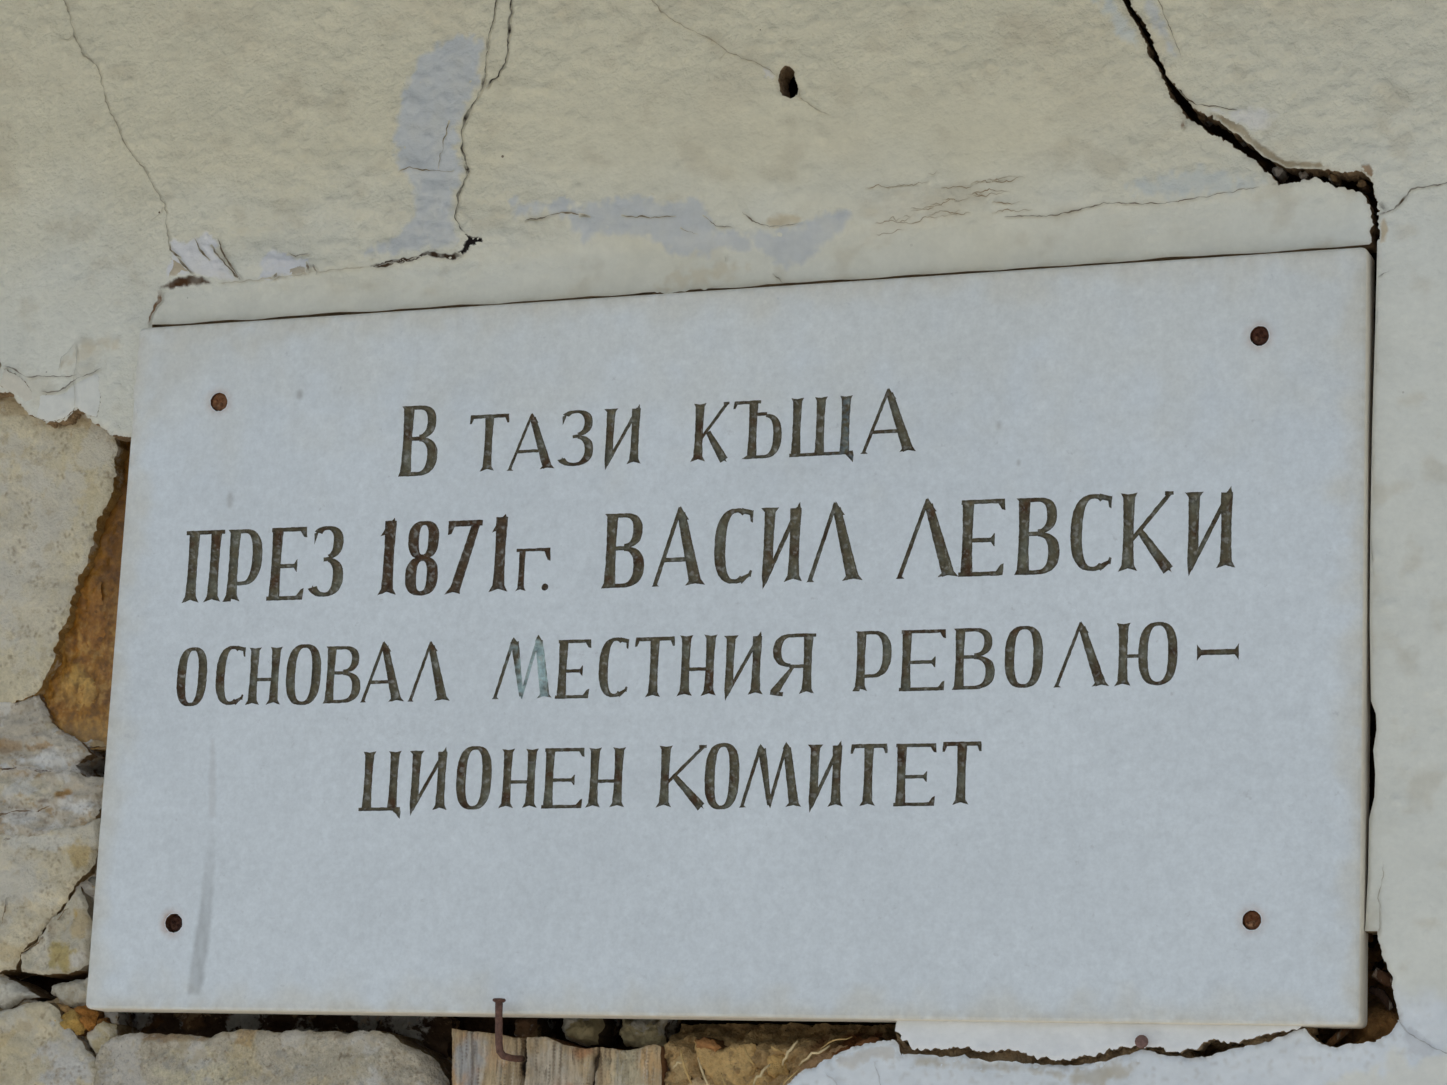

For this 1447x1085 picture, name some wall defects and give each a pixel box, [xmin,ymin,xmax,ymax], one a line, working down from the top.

crack [652,0,829,115]
crack [62,0,170,246]
crack [218,0,513,284]
crack [1123,0,1447,383]
spalling [147,230,318,325]
peeling [0,343,102,422]
crack [1369,692,1377,817]
peeling [833,1044,903,1072]